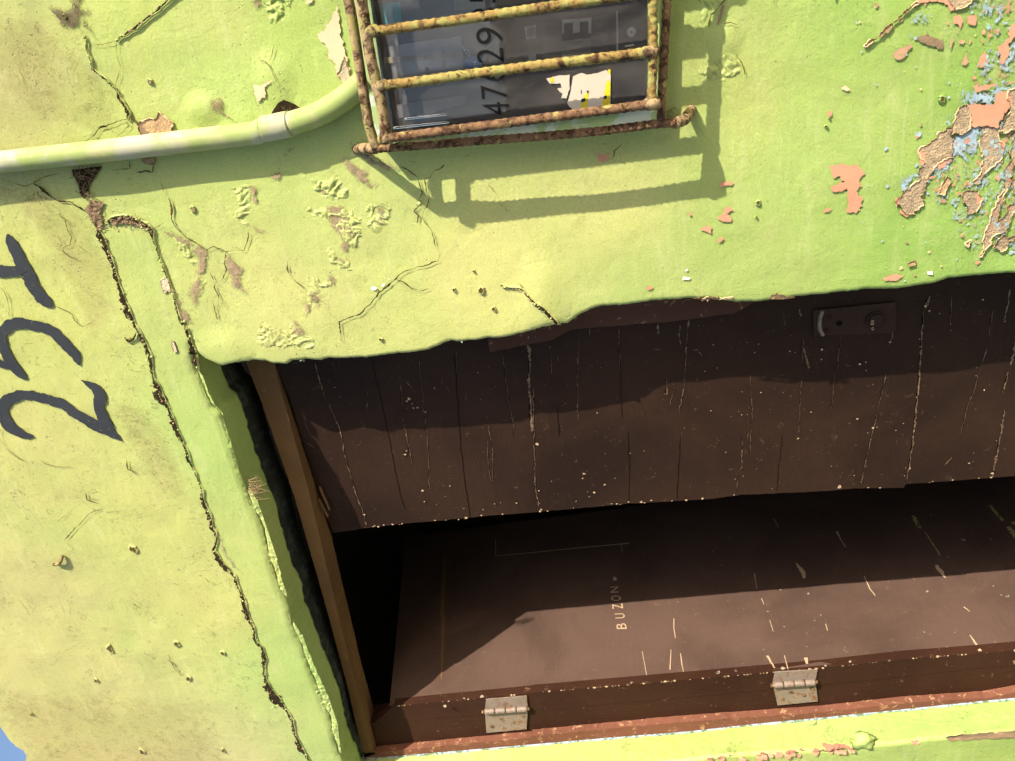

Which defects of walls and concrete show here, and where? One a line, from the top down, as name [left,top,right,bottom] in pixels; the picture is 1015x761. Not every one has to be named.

crack [83,0,173,141]
flaking render [318,7,351,83]
peeling [863,0,1015,258]
peeling [829,163,865,213]
crack [338,165,444,334]
crack [500,283,561,325]
peeling [883,260,916,281]
crack [10,160,311,761]
peeling [946,731,1015,742]